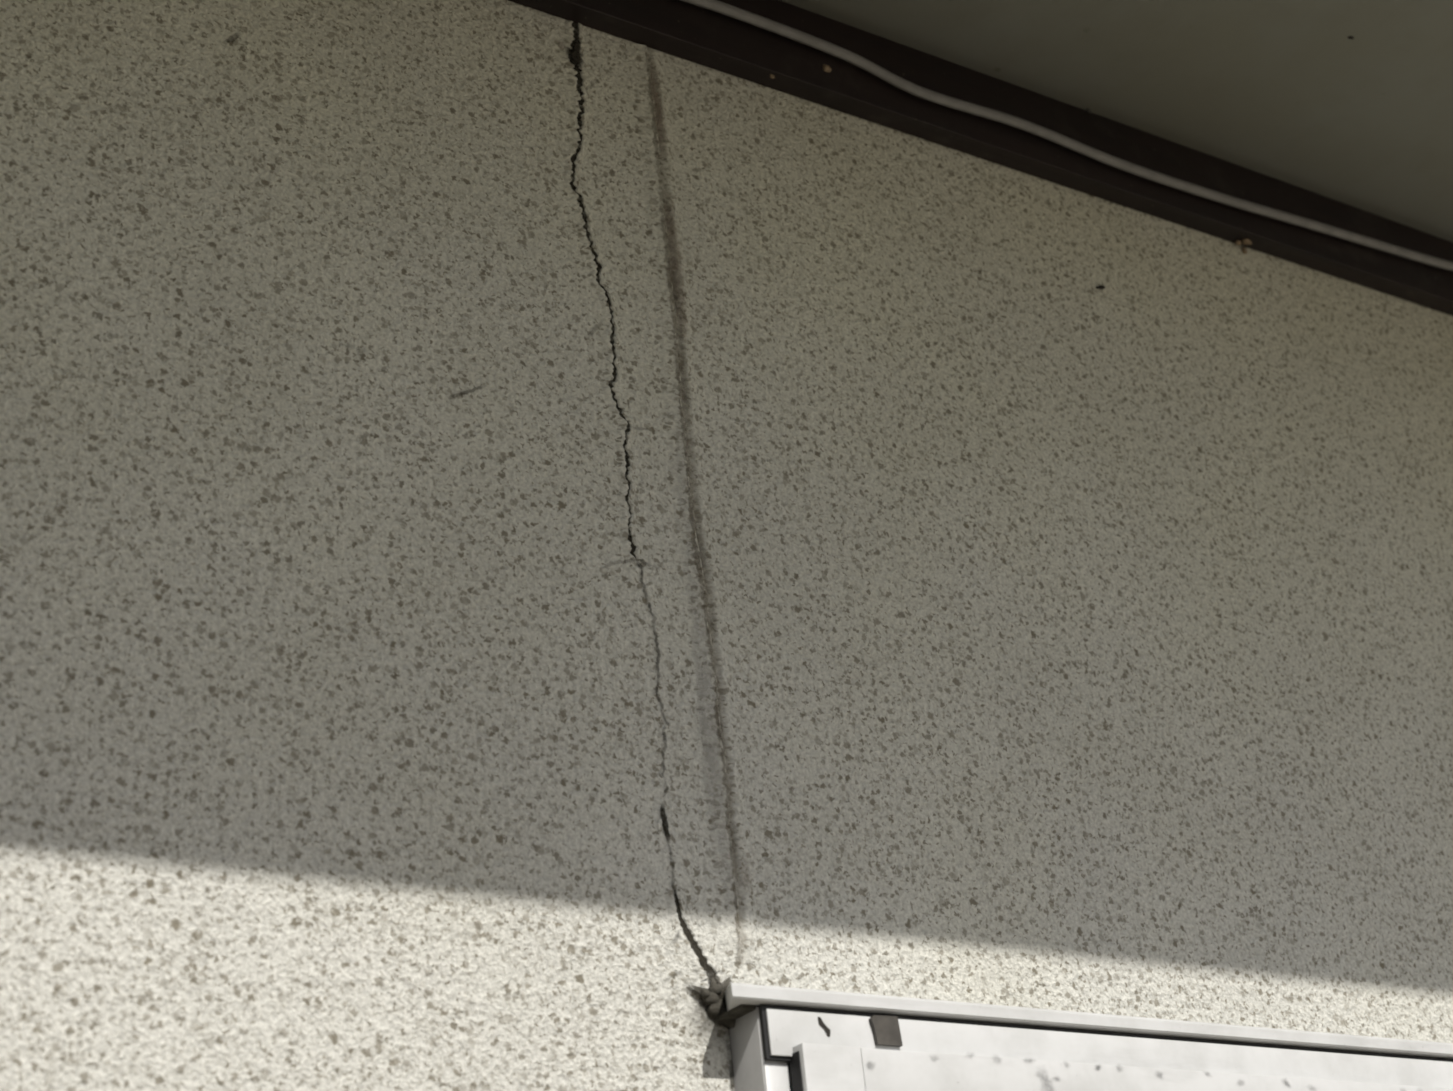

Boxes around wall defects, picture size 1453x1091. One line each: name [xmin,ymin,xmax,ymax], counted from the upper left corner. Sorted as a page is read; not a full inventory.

crack [561,20,670,840]
crack [665,889,720,982]